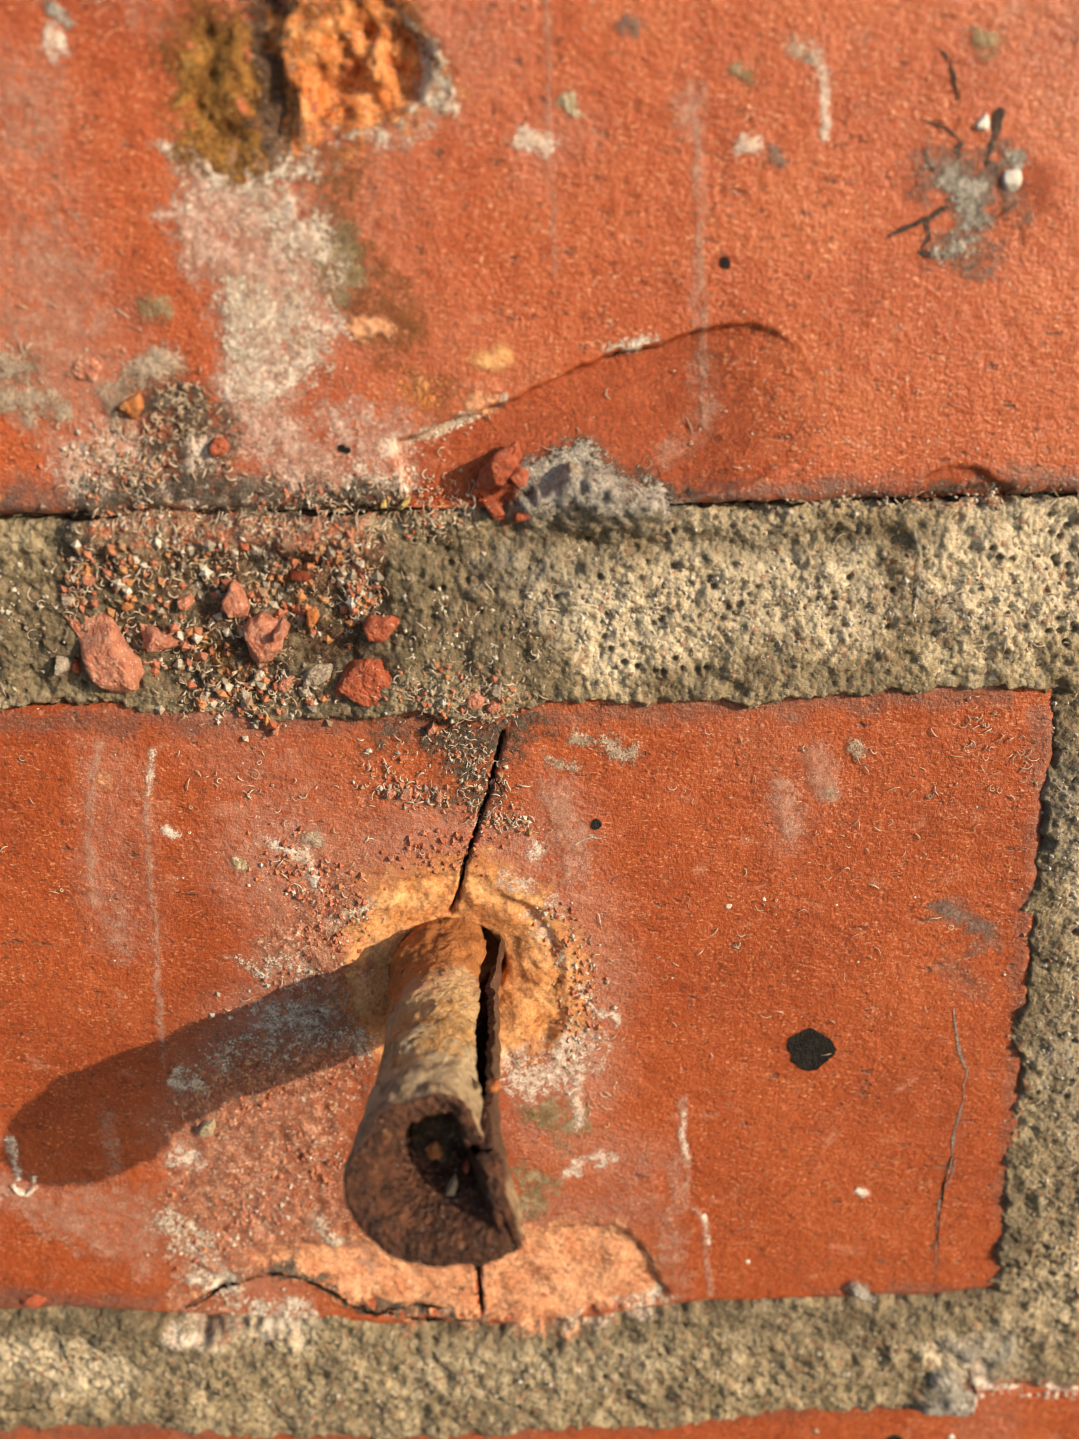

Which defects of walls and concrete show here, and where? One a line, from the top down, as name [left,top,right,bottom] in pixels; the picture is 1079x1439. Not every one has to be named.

corrosion [159,0,475,421]
water stain [0,135,451,580]
spalling [398,331,755,521]
spalling [65,601,179,694]
water stain [194,629,246,704]
spalling [220,579,320,669]
spalling [333,614,400,707]
crack [451,730,503,912]
spalling [140,831,674,1351]
corrosion [486,1077,500,1092]
corrosion [425,1140,443,1159]
crack [184,1266,483,1327]